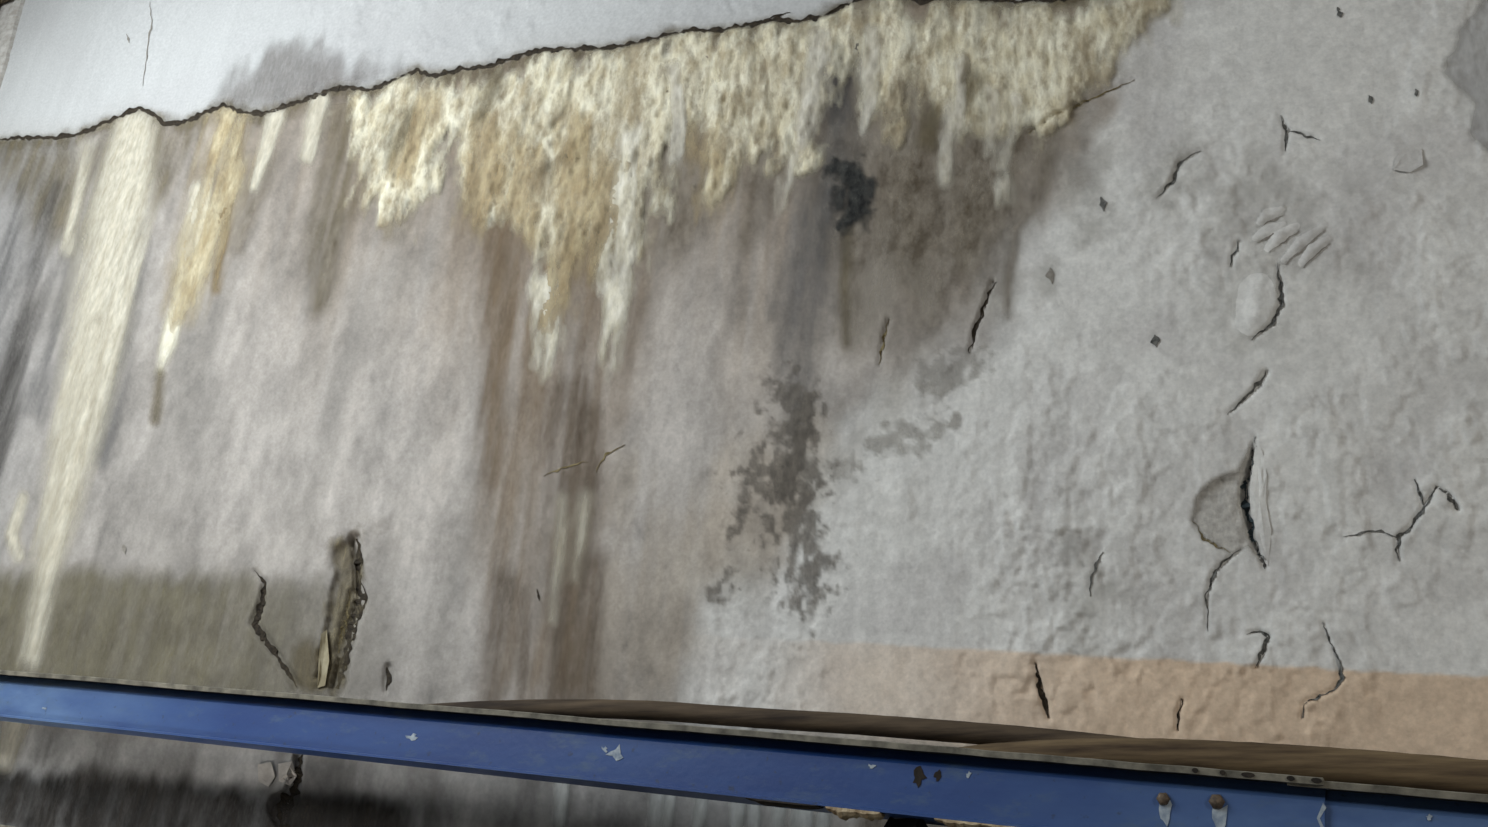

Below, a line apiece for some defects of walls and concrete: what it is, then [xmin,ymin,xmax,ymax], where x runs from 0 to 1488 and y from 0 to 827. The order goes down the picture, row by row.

leakage [152,0,1170,422]
crack [968,282,996,352]
leakage [0,112,270,690]
leakage [727,368,841,614]
crack [1348,479,1458,562]
crack [251,570,297,687]
crack [1035,663,1049,718]
crack [1302,625,1345,718]